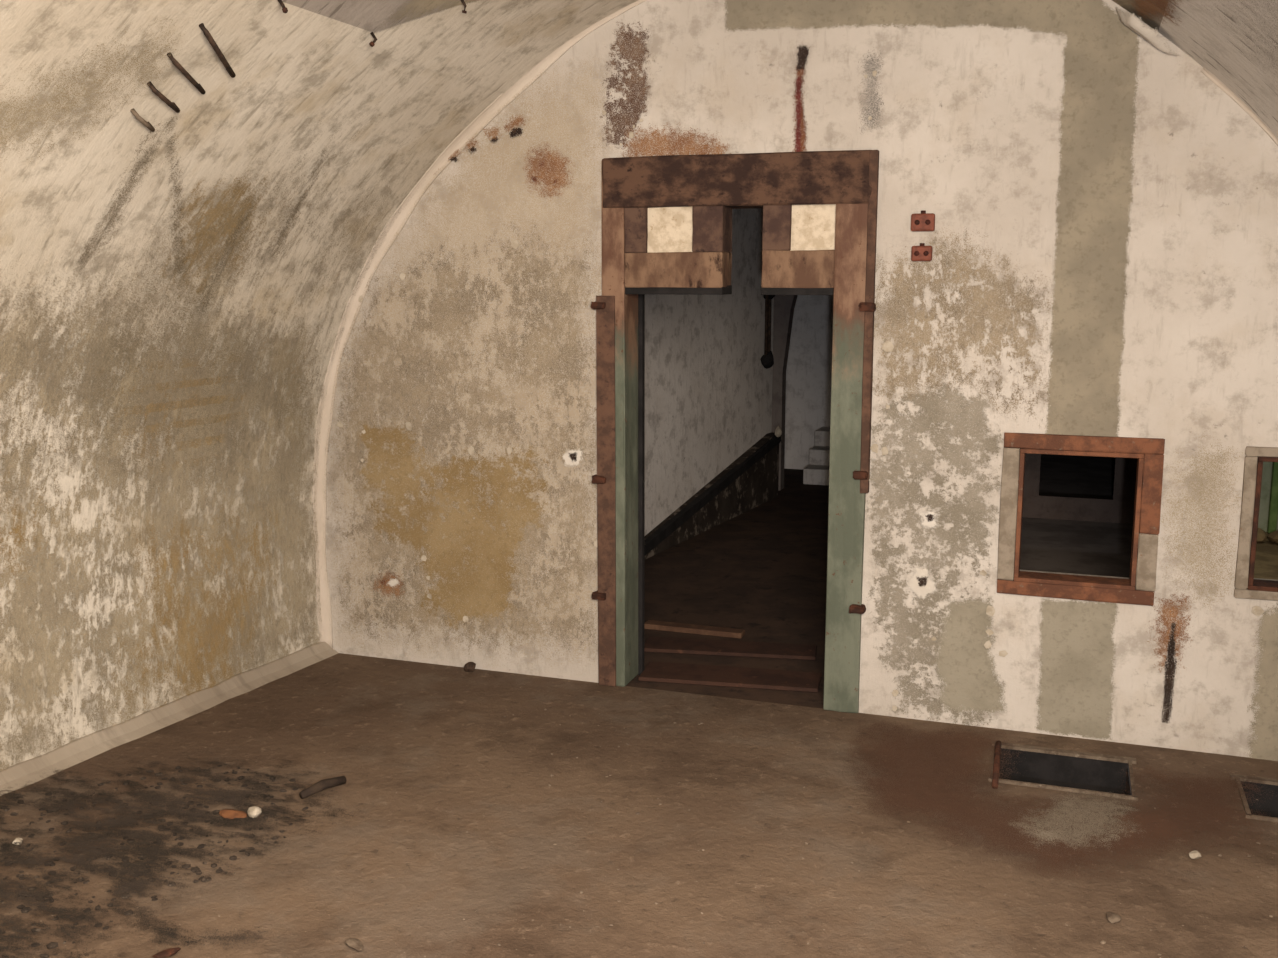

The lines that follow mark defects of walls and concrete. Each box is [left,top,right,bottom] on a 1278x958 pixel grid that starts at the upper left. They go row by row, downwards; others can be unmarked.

spalling [448,114,530,162]
rust [522,142,576,199]
peeling [598,21,652,150]
rust [621,122,731,157]
rust [792,44,811,152]
peeling [723,0,1158,742]
peeling [0,221,602,772]